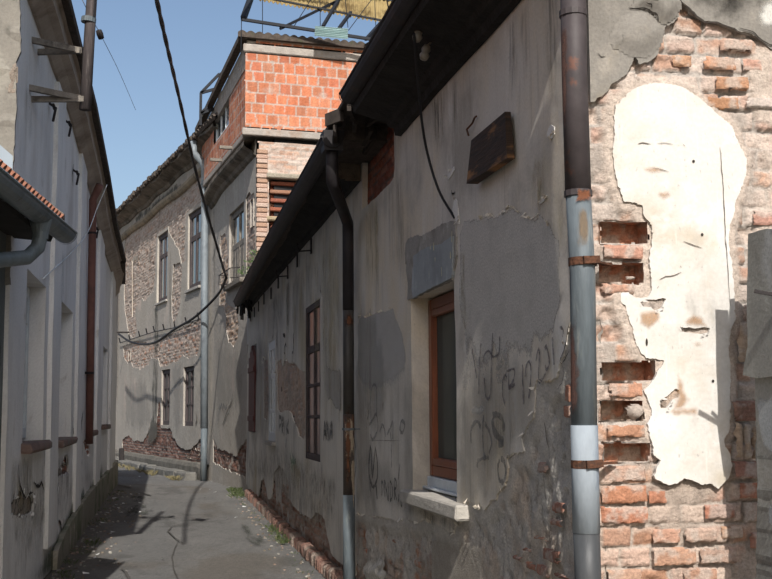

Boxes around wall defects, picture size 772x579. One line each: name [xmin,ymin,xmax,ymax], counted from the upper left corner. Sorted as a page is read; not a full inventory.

crack [680,0,772,45]
water stain [761,3,772,24]
spalling [589,7,772,579]
spalling [261,356,305,439]
spalling [123,402,201,462]
spalling [214,439,247,476]
spalling [355,334,575,579]
spalling [11,489,37,521]
spalling [259,466,343,570]